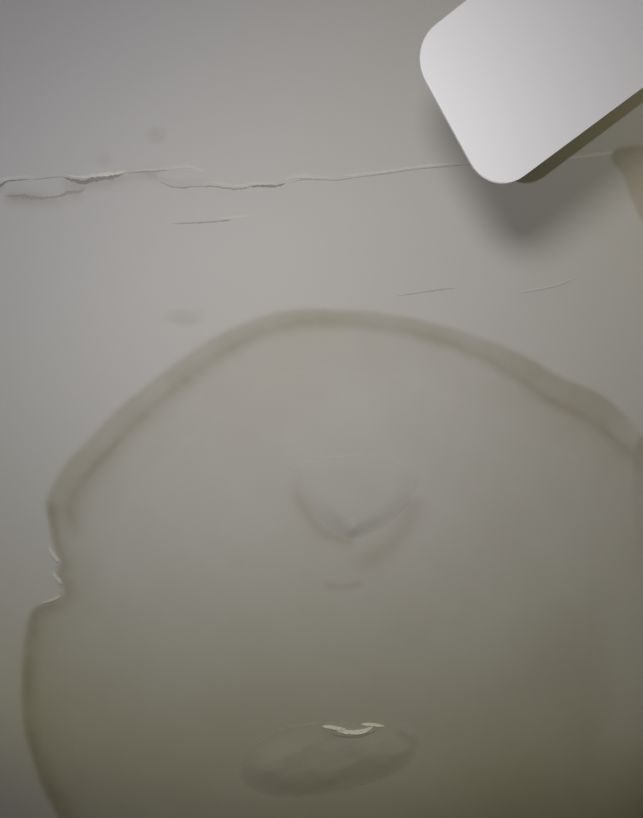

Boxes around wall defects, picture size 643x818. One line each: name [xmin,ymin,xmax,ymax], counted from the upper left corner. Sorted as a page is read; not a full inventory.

crack [0,163,463,201]
peeling [323,723,384,738]